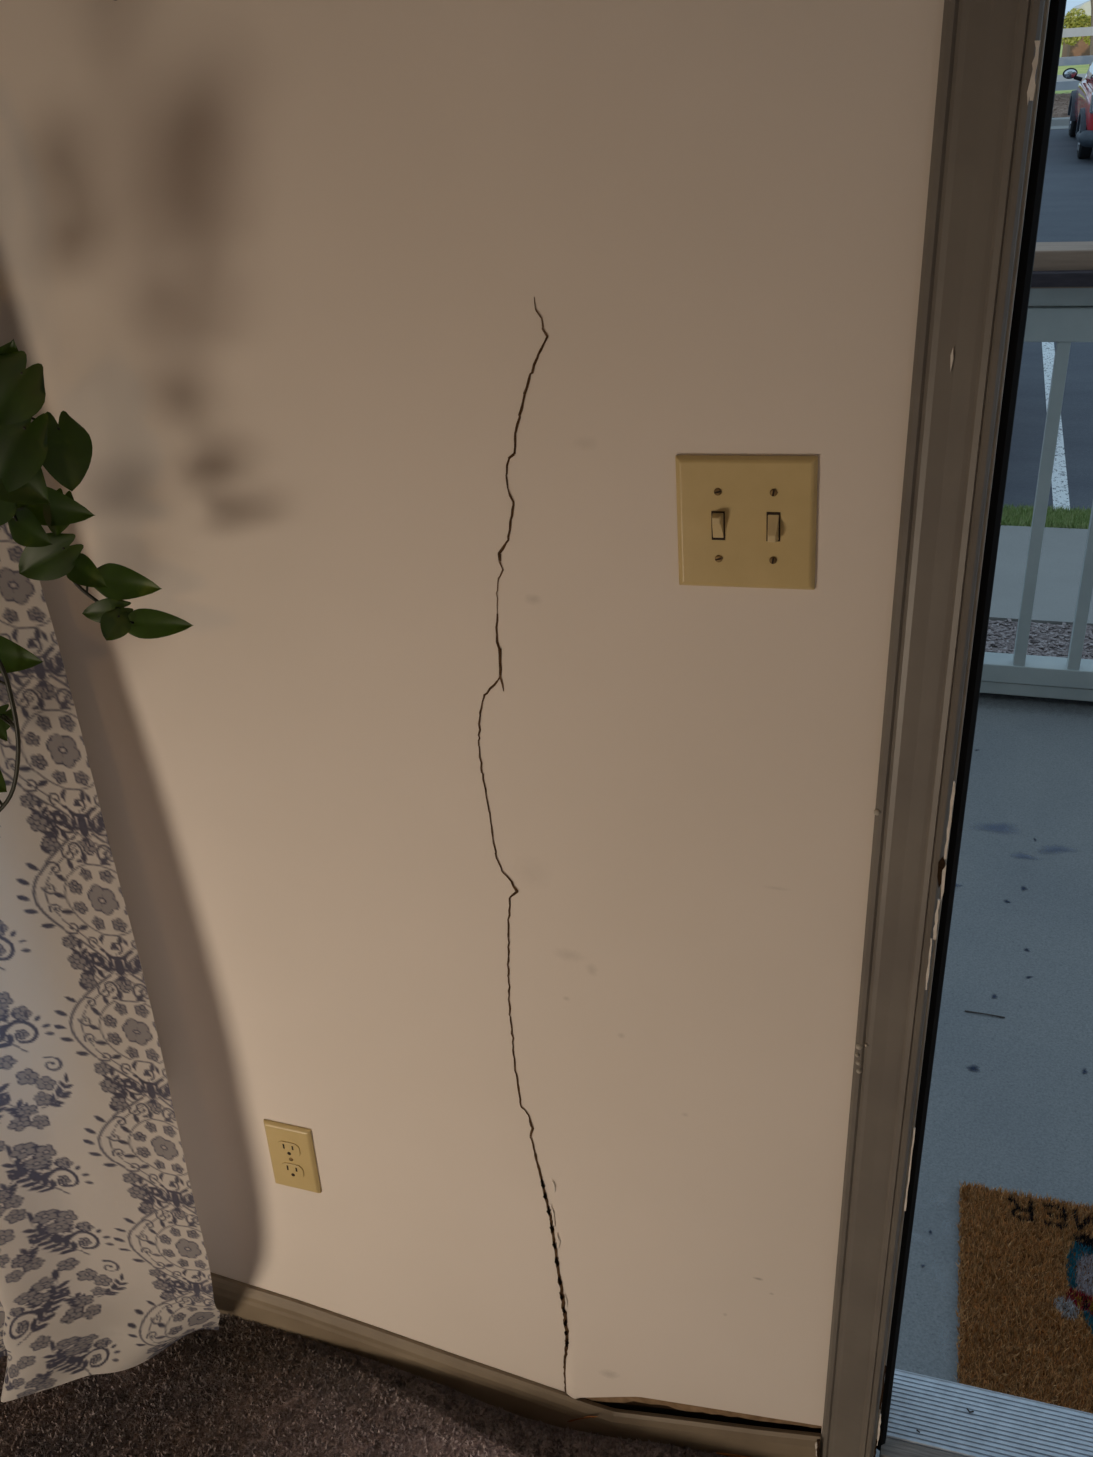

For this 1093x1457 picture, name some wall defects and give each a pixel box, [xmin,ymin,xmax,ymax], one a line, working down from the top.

crack [478,297,595,1422]